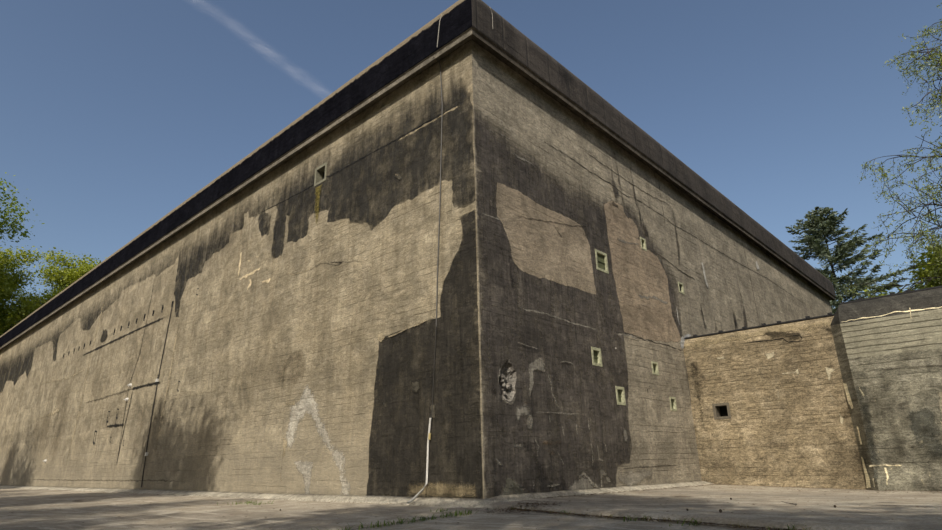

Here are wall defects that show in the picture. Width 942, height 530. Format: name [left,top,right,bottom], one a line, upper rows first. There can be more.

water stain [612,168,648,235]
peeling [0,288,125,392]
efflorescence [282,385,350,495]
water stain [516,358,555,427]
peeling [145,82,942,499]
crack [884,363,942,371]